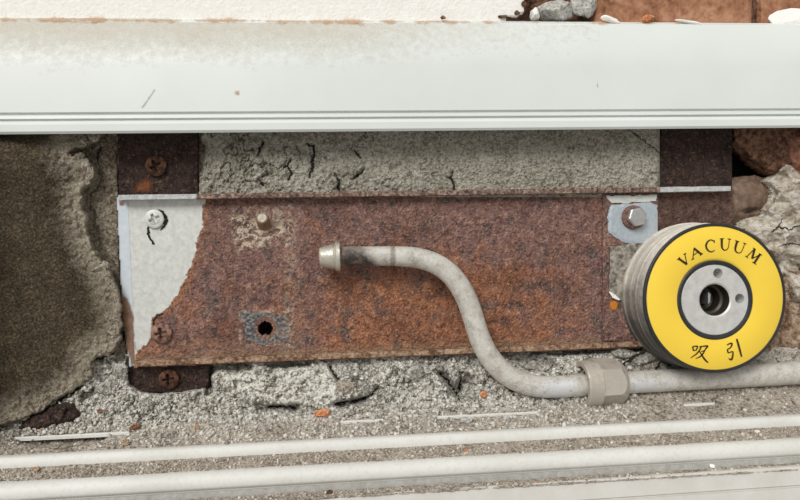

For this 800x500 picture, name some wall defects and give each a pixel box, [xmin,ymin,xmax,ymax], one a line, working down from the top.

crack [283,143,315,181]
crack [336,150,364,191]
rust [658,190,732,231]
rust [122,191,642,368]
crack [334,388,378,405]
crack [440,373,462,401]